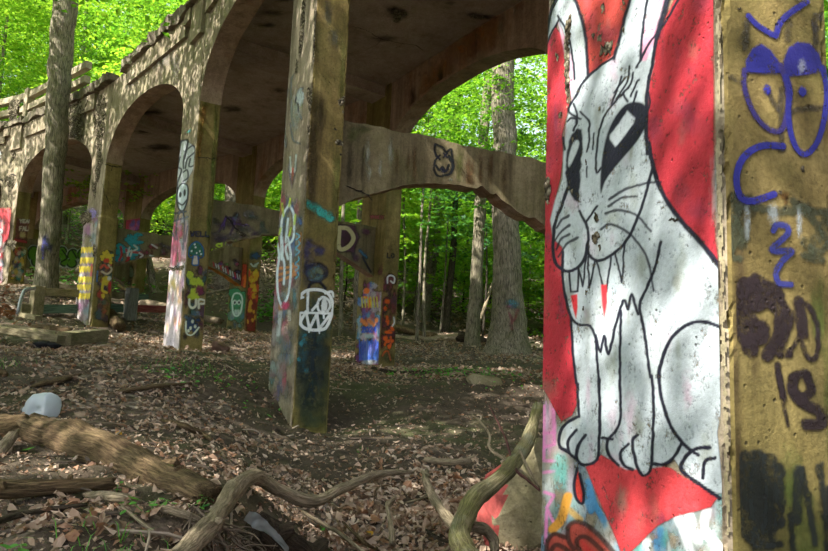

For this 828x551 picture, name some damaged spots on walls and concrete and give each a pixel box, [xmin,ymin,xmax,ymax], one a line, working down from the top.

leakage [784,469,798,511]